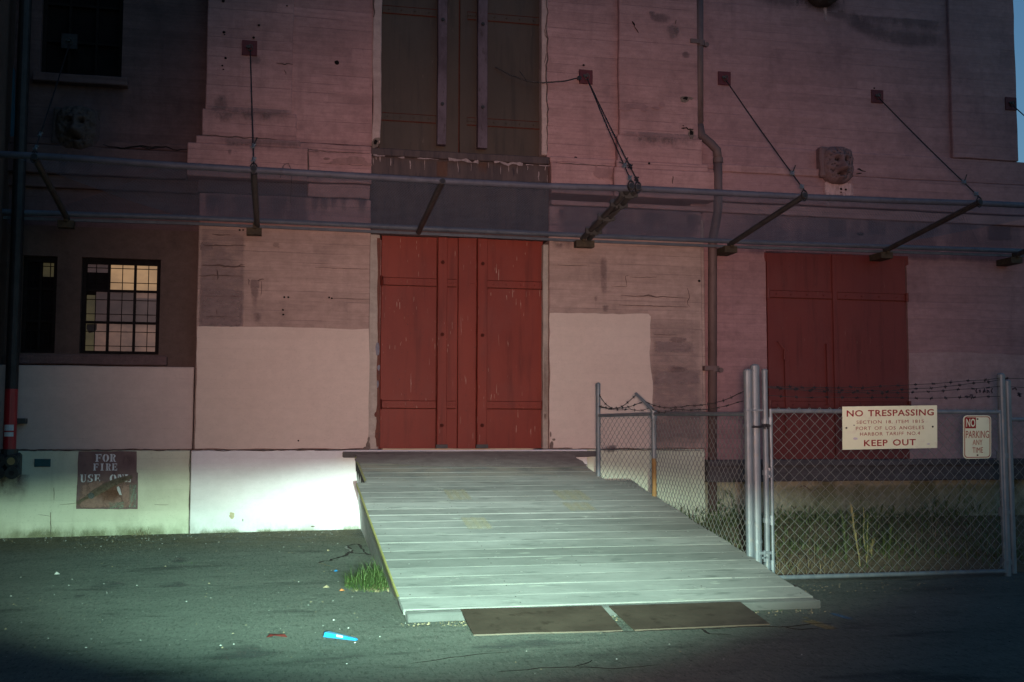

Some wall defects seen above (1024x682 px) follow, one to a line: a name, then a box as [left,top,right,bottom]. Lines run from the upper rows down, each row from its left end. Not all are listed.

crack [103,135,277,151]